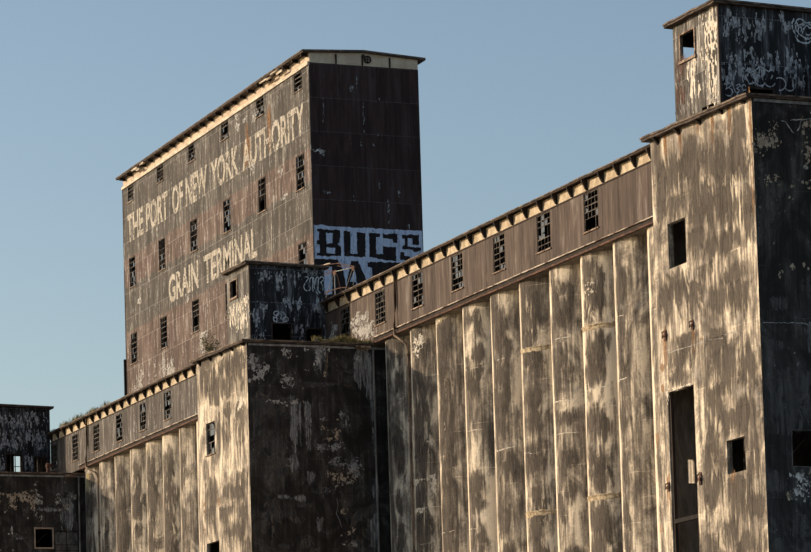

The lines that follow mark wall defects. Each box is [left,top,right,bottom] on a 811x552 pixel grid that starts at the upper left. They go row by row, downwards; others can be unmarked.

peeling [687,6,811,109]
peeling [751,121,782,157]
water stain [655,107,774,323]
peeling [0,481,43,521]
peeling [246,353,270,383]
peeling [314,410,364,487]
water stain [386,317,459,552]
water stain [498,279,578,552]
water stain [582,257,610,389]
water stain [564,402,633,552]
water stain [668,327,811,552]
peeling [786,468,811,506]